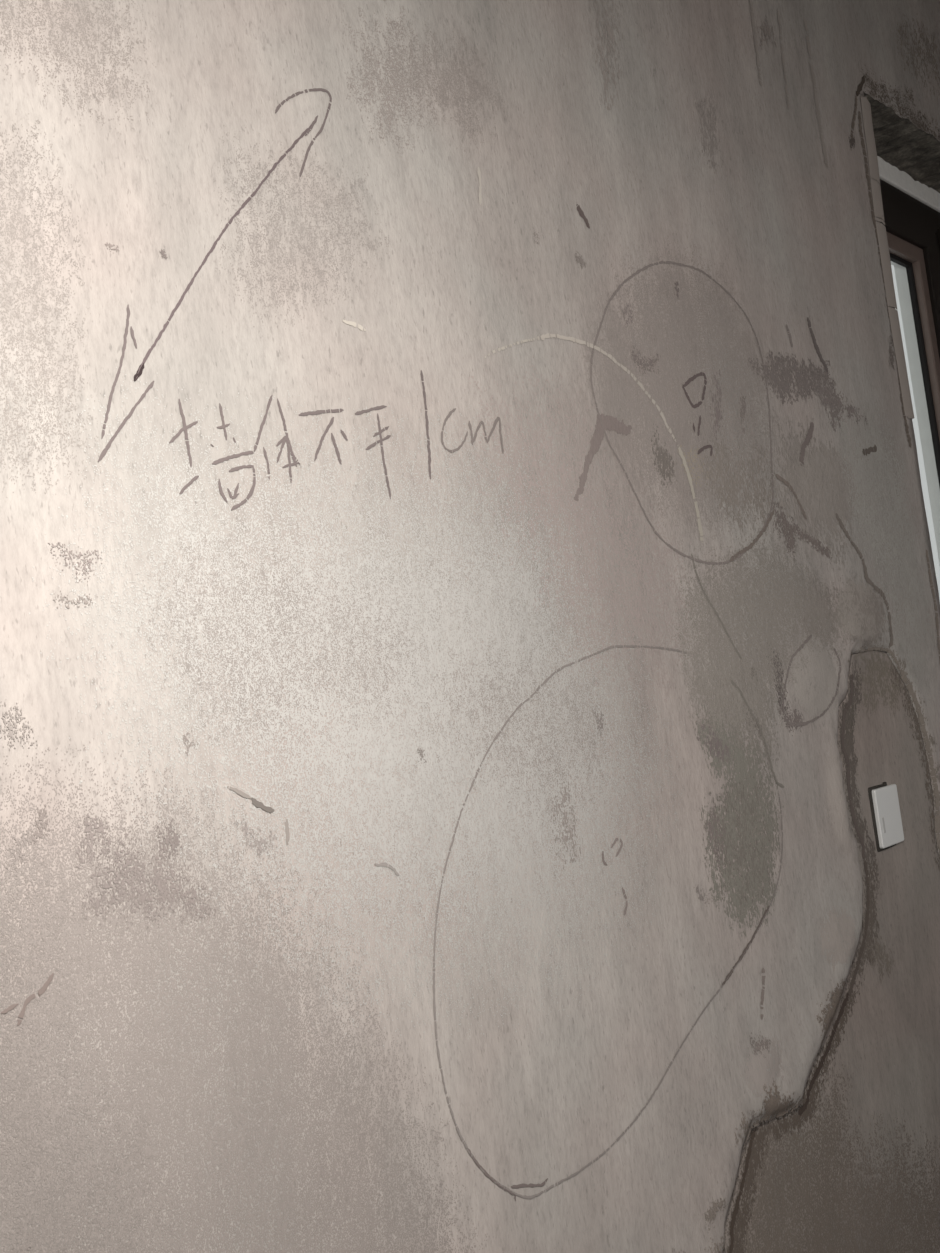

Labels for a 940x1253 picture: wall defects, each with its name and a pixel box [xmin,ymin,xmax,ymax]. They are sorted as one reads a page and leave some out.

damp [572,238,940,936]